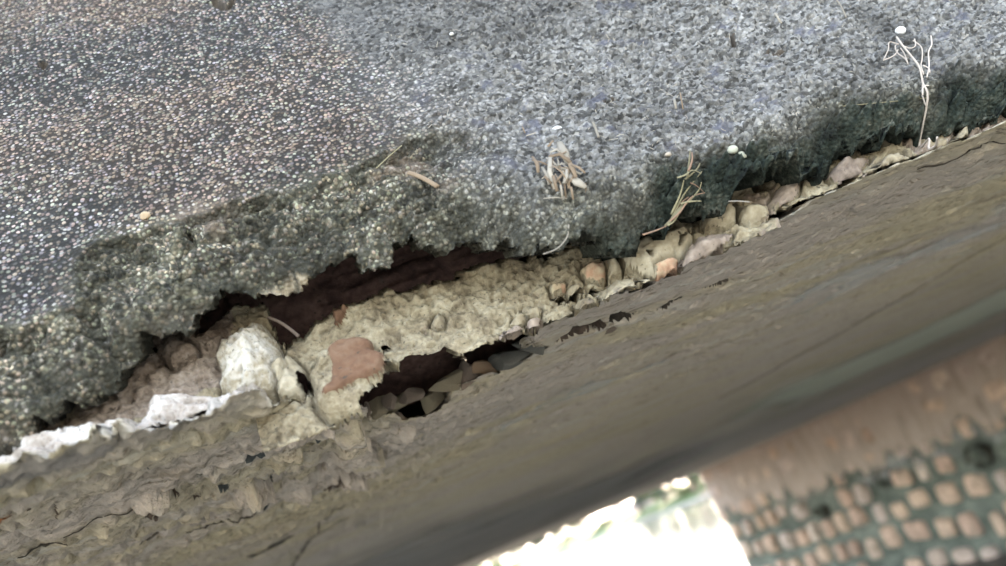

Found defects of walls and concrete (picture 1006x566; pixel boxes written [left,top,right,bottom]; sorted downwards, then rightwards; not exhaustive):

spalling [0,64,1006,456]
flaking render [135,311,634,522]
crack [247,505,346,566]